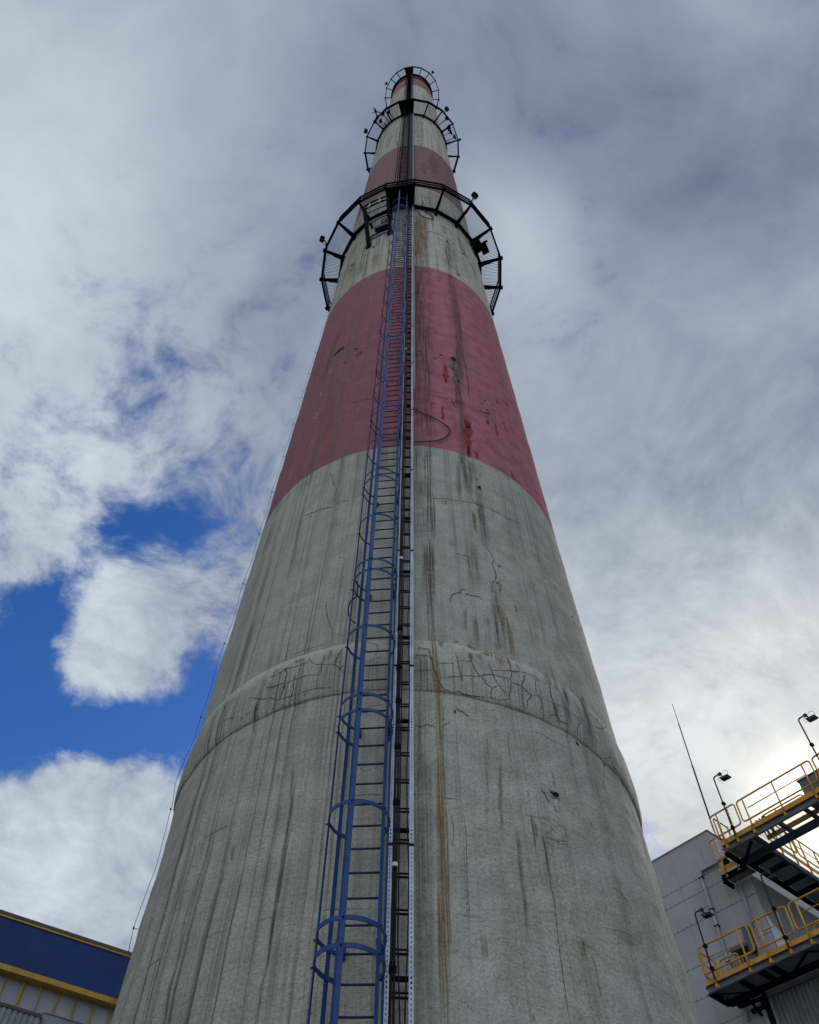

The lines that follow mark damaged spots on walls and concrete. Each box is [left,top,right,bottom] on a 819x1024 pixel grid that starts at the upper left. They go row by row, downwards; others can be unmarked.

crack [450,548,501,601]
crack [417,647,607,736]
rust [431,640,450,998]